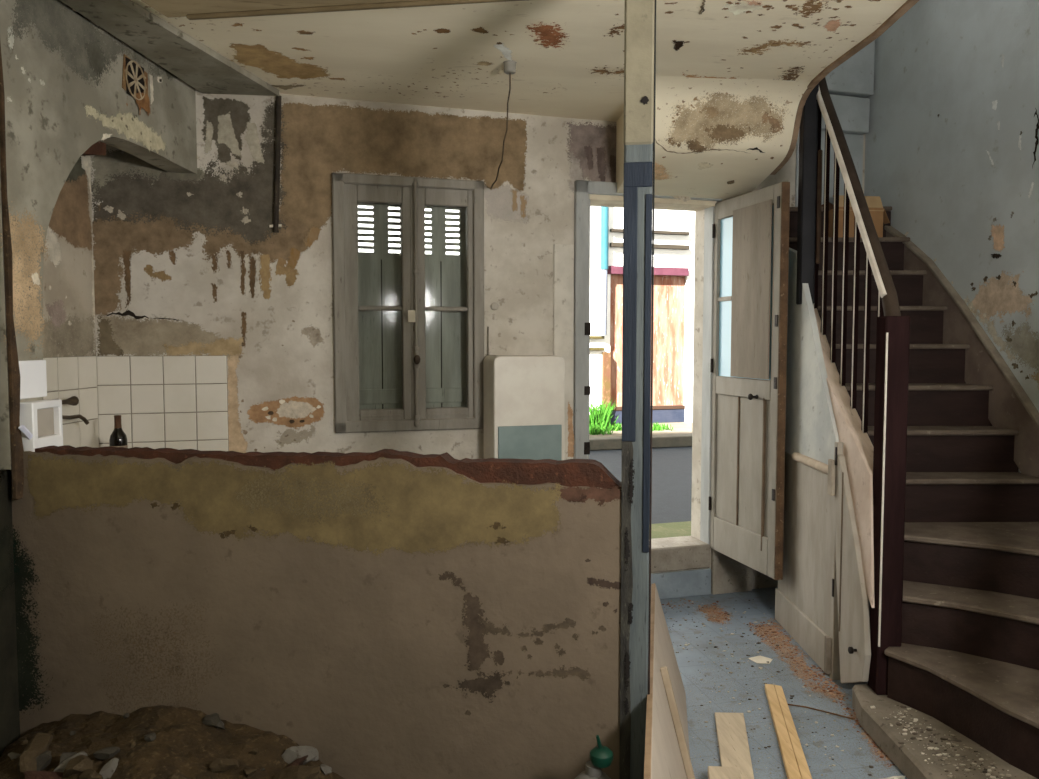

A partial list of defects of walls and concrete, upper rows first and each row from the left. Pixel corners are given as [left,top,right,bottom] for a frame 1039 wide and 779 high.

peeling [586,65,624,76]
spalling [722,0,856,72]
peeling [81,156,92,202]
peeling [84,105,167,154]
peeling [201,96,264,167]
crack [655,139,765,154]
damp [663,66,805,159]
crack [1031,108,1039,169]
flaking render [970,212,1038,327]
spalling [227,346,325,453]